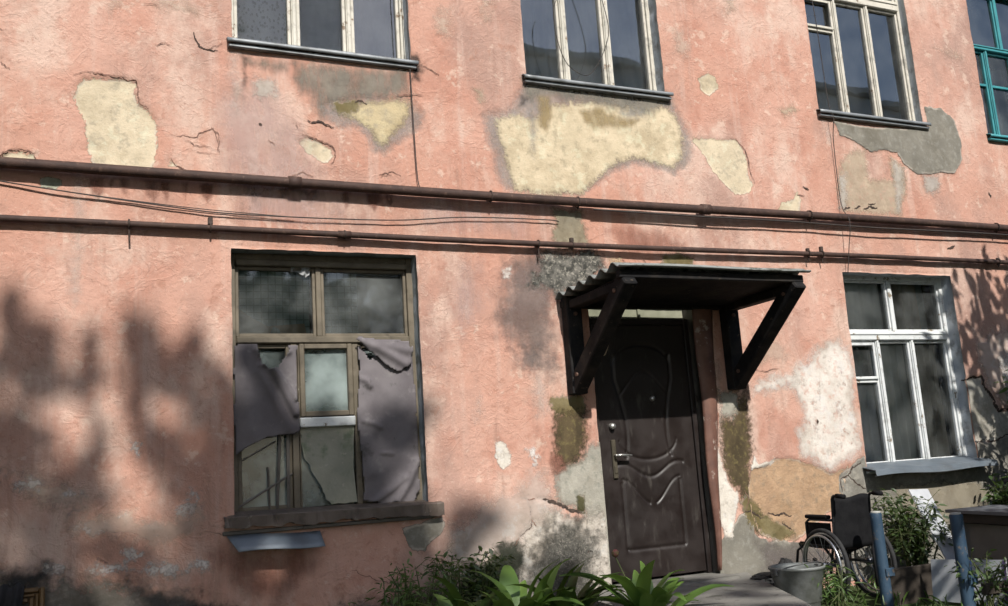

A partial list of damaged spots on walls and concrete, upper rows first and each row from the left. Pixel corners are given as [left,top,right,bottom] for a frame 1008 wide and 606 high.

peeling [73,71,158,167]
peeling [299,134,336,163]
spalling [332,94,424,145]
spalling [496,79,753,195]
peeling [837,150,906,215]
damp [501,208,625,366]
peeling [495,441,511,469]
damp [549,395,588,473]
damp [719,389,762,535]
peeling [718,333,1008,568]
damp [765,548,829,565]
spalling [838,546,875,581]